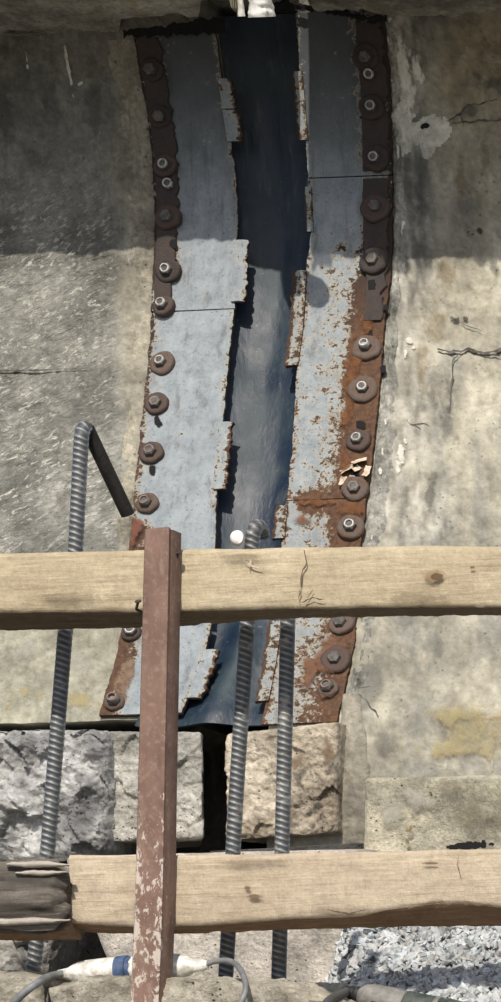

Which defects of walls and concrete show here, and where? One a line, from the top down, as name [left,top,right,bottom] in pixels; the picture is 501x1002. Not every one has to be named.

crack [447,99,501,124]
spalling [412,114,452,159]
rust [339,353,361,424]
crack [437,322,501,411]
rust [296,498,363,523]
rust [114,658,134,698]
rust [300,636,345,689]